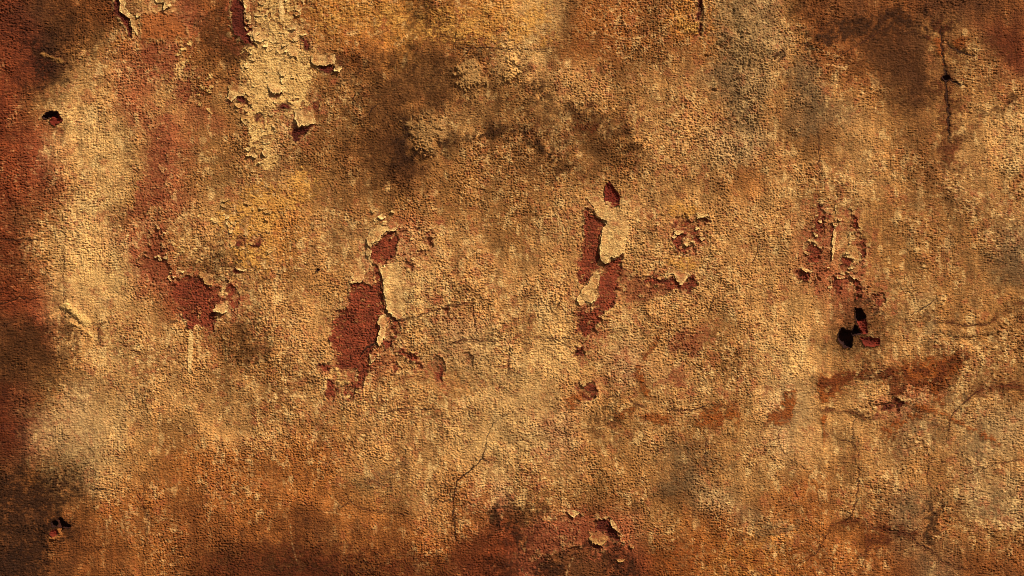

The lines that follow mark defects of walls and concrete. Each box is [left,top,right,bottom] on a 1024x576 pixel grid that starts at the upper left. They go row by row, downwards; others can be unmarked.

peeling [230,0,342,73]
peeling [227,69,319,164]
crack [940,27,974,142]
peeling [212,197,273,255]
peeling [667,212,711,255]
peeling [167,267,246,333]
peeling [316,208,446,402]
peeling [573,195,630,360]
peeling [644,270,700,294]
peeling [797,203,885,347]
peeling [588,519,634,562]